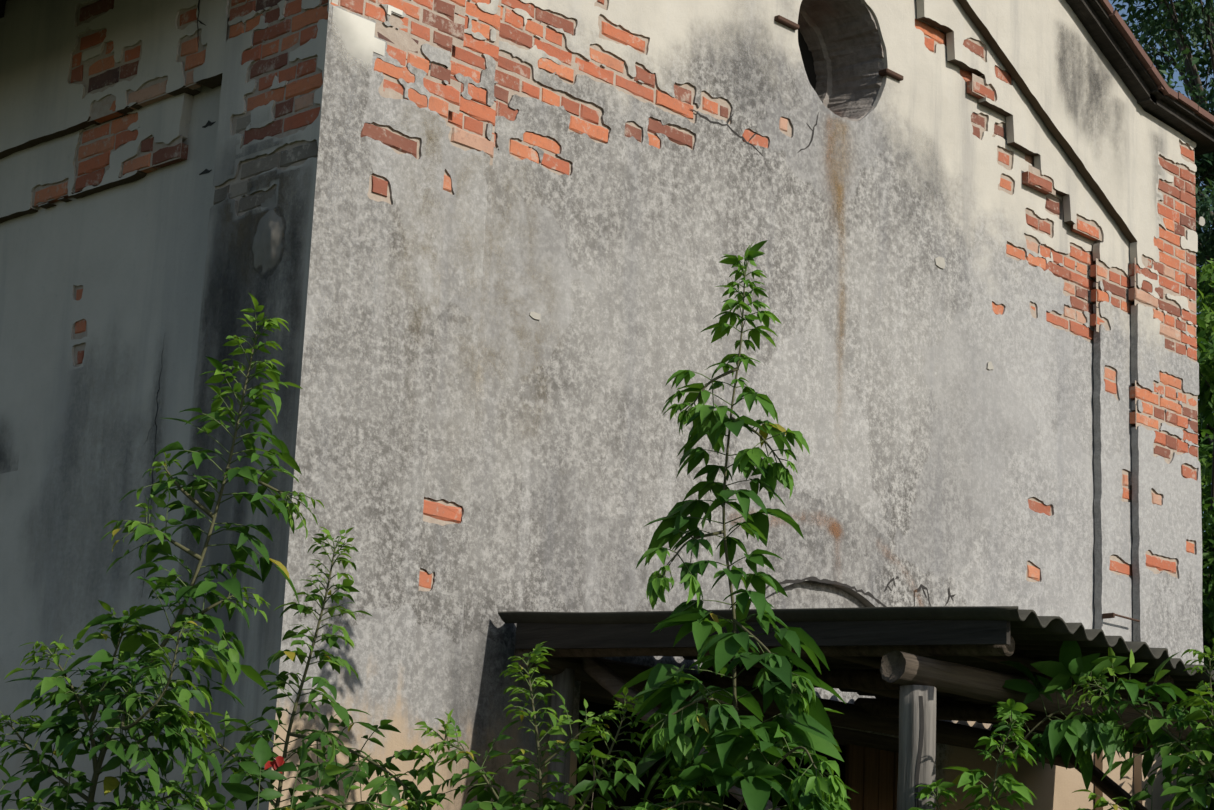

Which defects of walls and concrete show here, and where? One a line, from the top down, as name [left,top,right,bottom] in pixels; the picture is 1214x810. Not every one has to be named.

flaking render [915,19,947,53]
flaking render [32,0,207,207]
flaking render [213,0,731,216]
crack [691,109,763,156]
flaking render [742,117,792,148]
crack [798,112,819,152]
flaking render [960,38,1205,362]
flaking render [73,319,88,367]
flaking render [1103,366,1198,480]